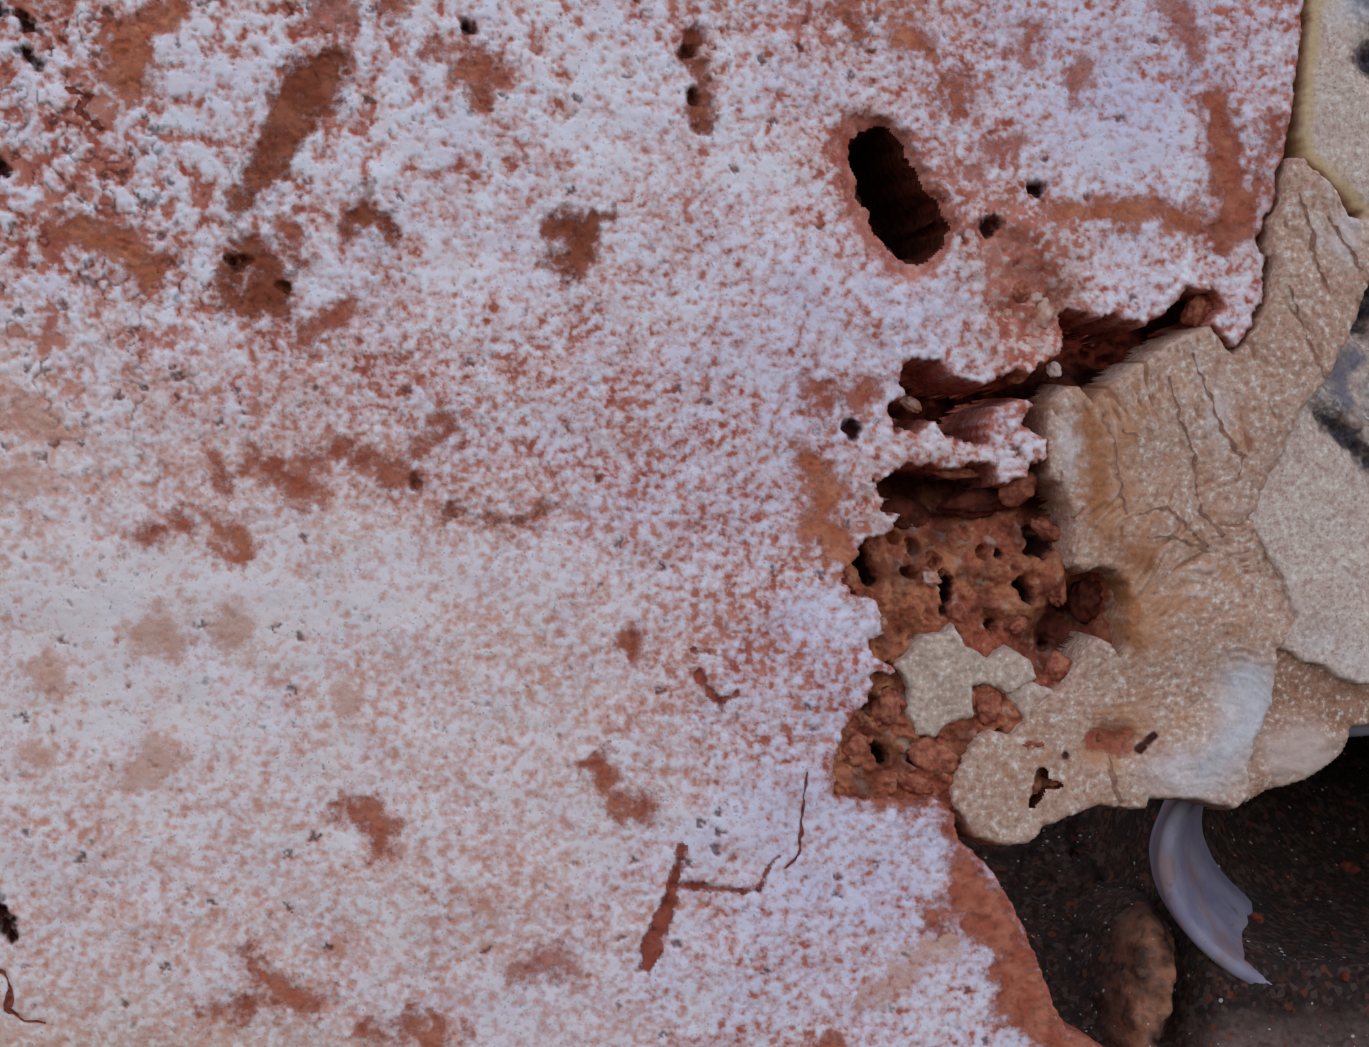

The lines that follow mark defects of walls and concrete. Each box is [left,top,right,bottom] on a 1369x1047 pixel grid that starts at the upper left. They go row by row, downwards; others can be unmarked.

water stain [1356,39,1369,75]
spalling [801,280,1212,436]
crack [1102,352,1247,553]
crack [1288,192,1363,378]
water stain [1309,284,1369,468]
spalling [793,438,1115,1047]
efflorescence [1199,664,1272,776]